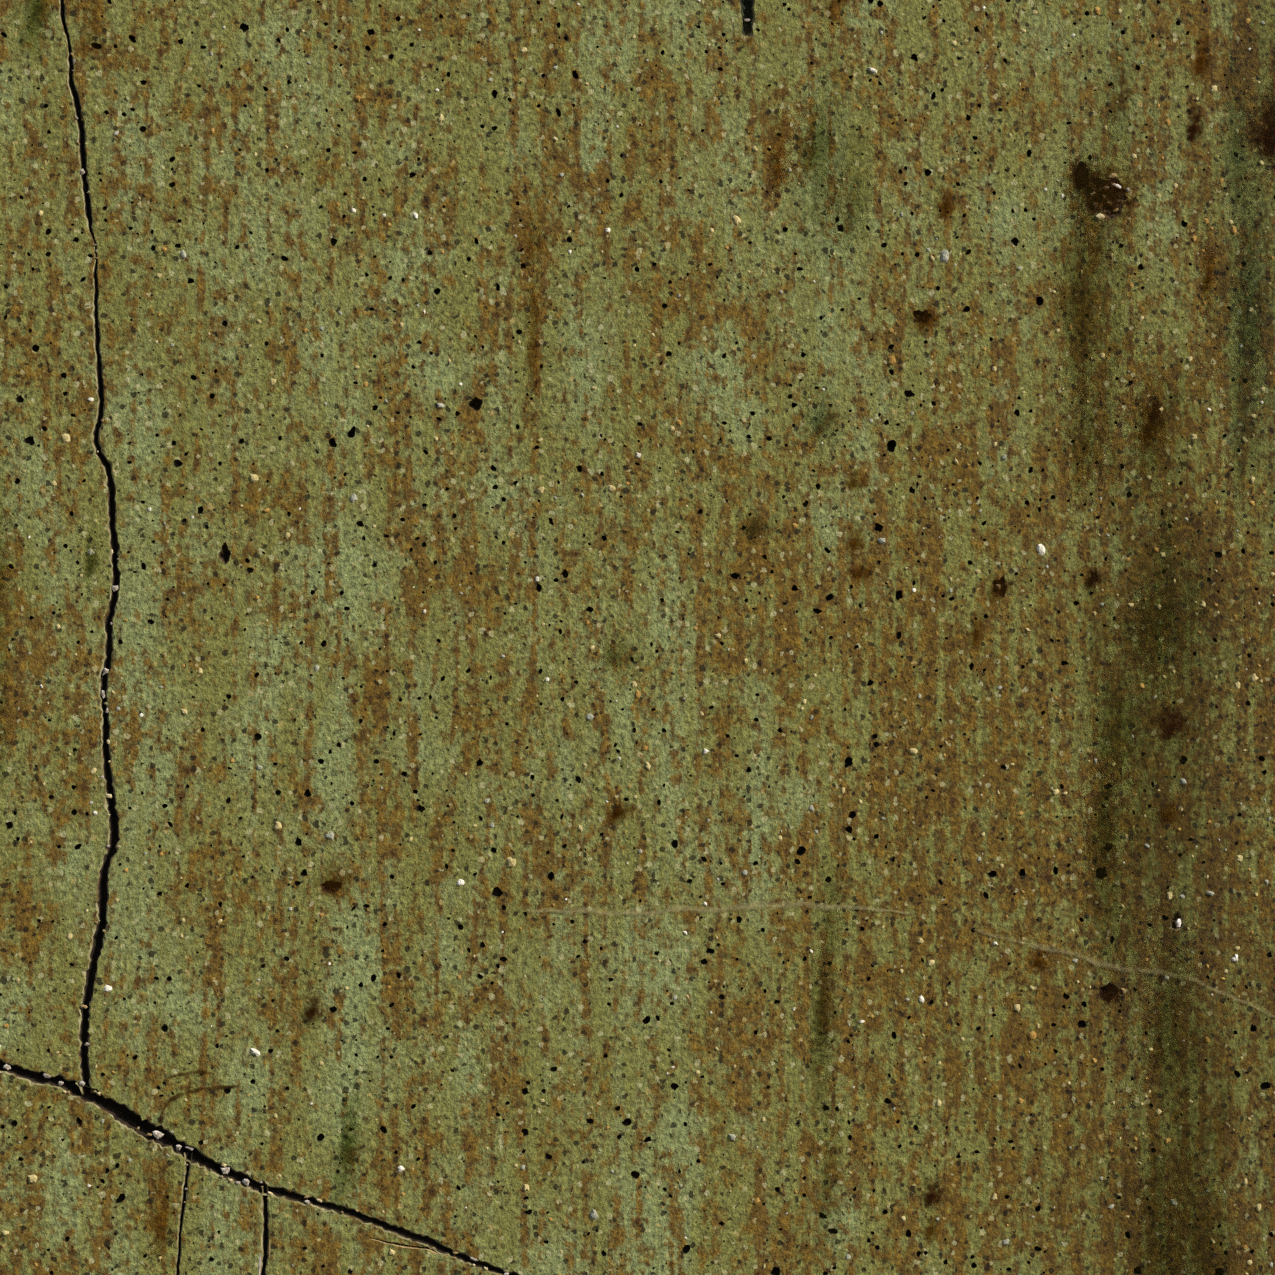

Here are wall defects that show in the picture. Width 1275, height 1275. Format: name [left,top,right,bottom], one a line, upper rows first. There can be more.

rust [1187,106,1204,142]
rust [1251,102,1275,163]
rust [1085,569,1102,588]
crack [0,0,520,1275]
crack [531,901,914,917]
crack [979,930,1273,1016]
rust [305,996,324,1022]
rust [923,1182,945,1208]